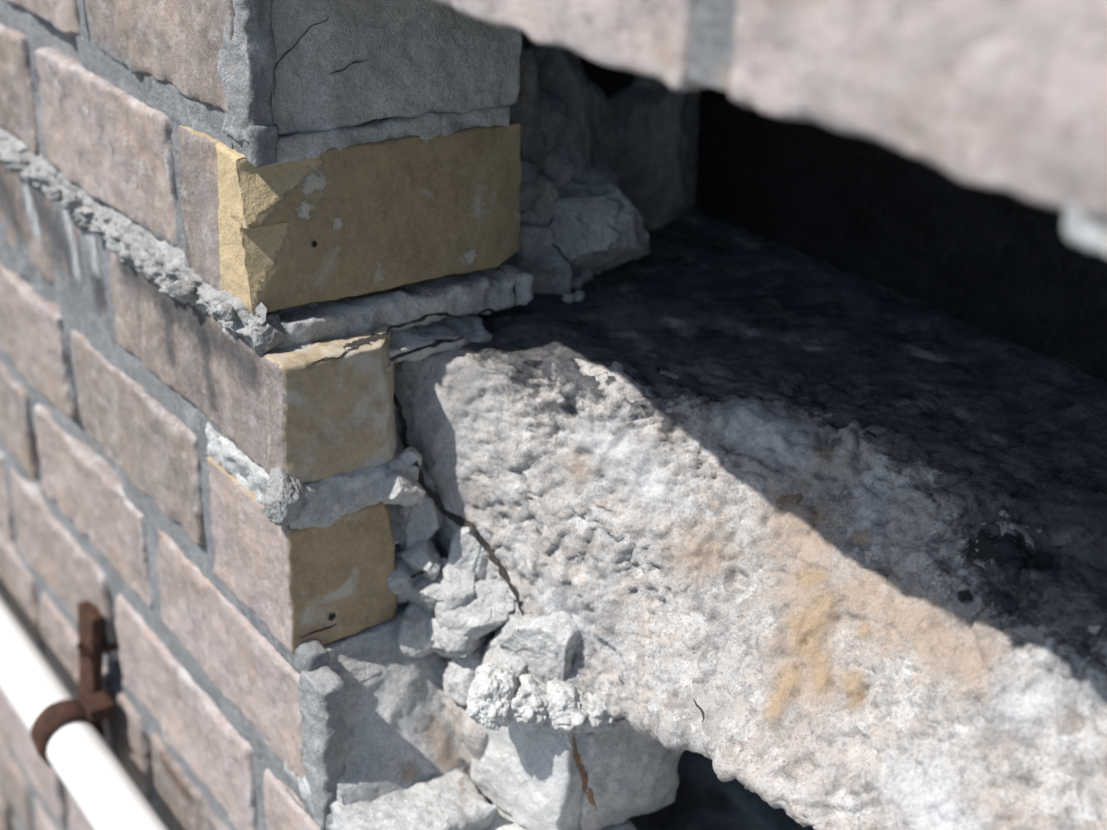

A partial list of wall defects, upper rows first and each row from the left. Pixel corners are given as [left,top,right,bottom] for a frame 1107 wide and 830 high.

crack [274,16,330,94]
crack [329,60,366,75]
crack [306,283,523,631]
leakage [466,206,1107,732]
spalling [429,532,449,559]
spalling [438,358,1107,830]
leakage [881,759,982,830]